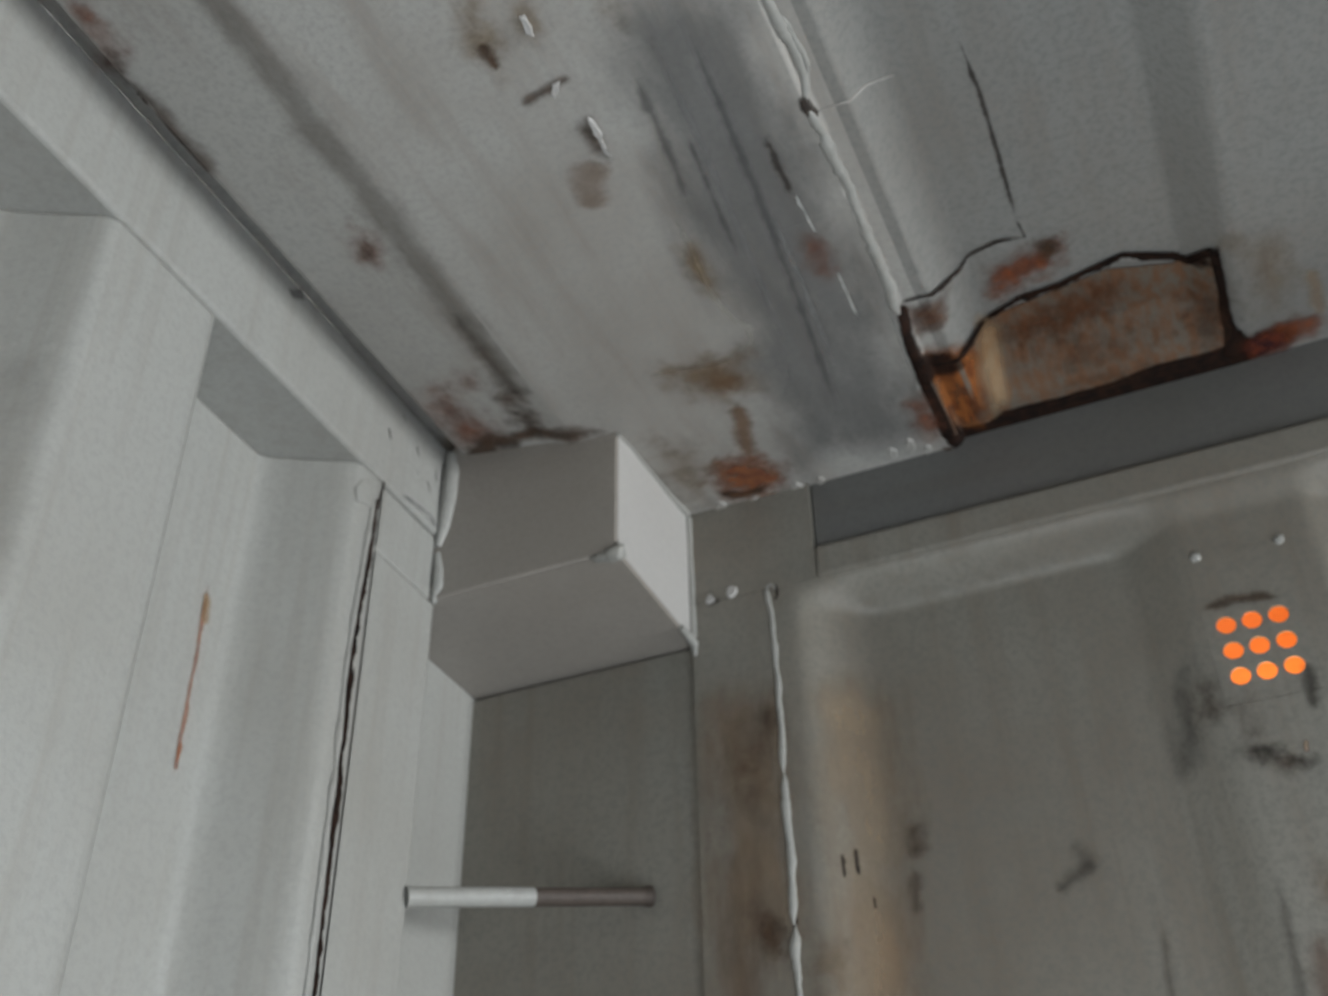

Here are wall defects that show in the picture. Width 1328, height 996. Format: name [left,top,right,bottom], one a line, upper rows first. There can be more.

rust [898,248,1319,451]
rust [445,408,588,455]
rust [714,408,779,498]